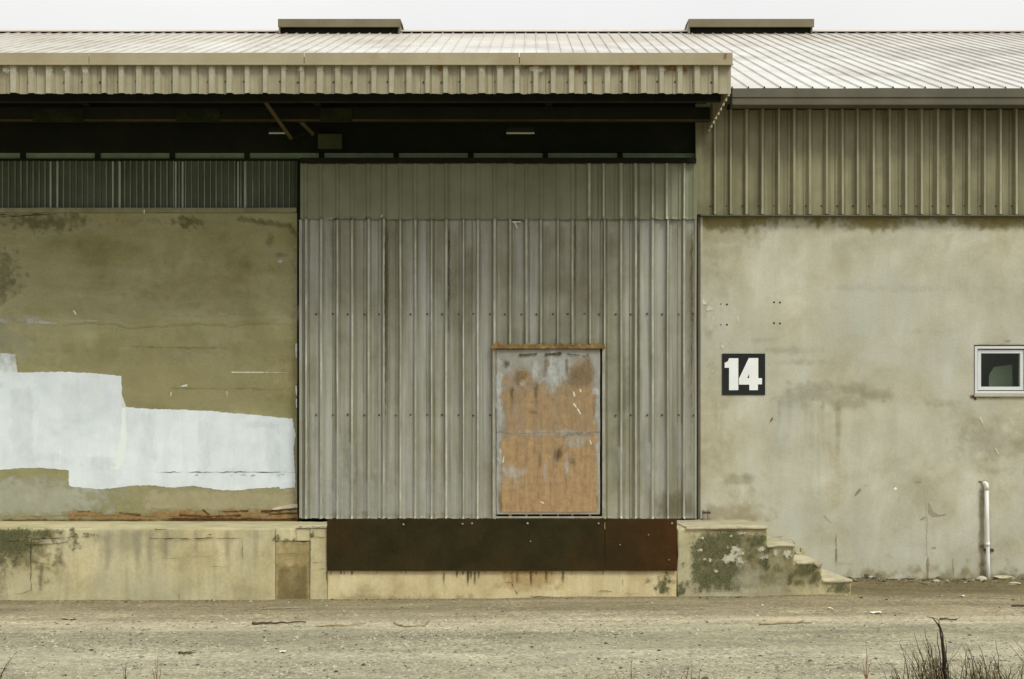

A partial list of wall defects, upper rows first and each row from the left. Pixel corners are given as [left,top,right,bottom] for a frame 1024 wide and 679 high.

water stain [791,214,949,230]
water stain [963,217,1024,229]
water stain [691,215,767,364]
corrosion [499,359,598,513]
corrosion [4,504,298,521]